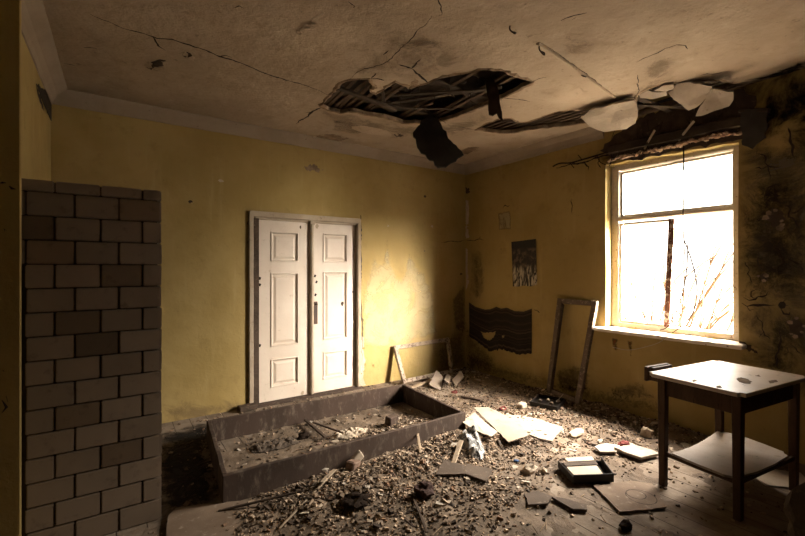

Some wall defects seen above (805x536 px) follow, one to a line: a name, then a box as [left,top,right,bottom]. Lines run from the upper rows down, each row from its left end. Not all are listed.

crack [90,14,327,124]
crack [353,0,442,83]
spalling [600,89,757,164]
crack [742,247,803,367]
leakage [746,144,805,368]